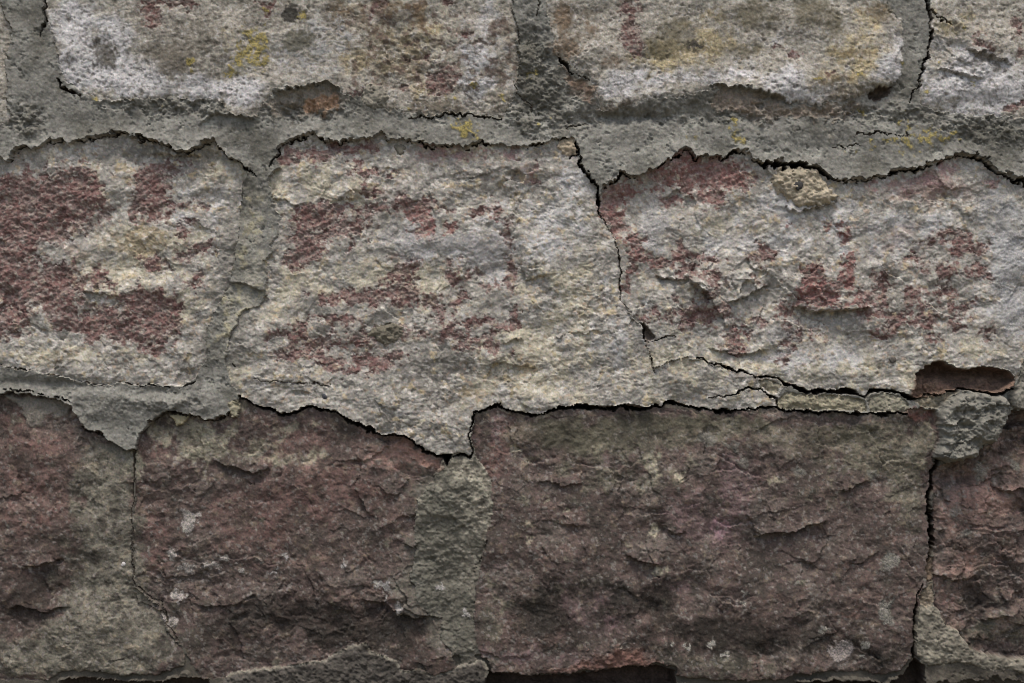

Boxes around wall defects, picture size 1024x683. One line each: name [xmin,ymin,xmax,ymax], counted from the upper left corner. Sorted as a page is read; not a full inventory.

crack [909,0,953,103]
crack [7,130,349,177]
crack [408,111,502,151]
crack [657,130,1024,188]
crack [529,123,676,374]
crack [3,366,93,402]
crack [81,426,105,437]
peeling [228,400,241,418]
crack [124,357,1014,460]
spalling [905,361,1021,423]
crack [911,455,954,659]
spalling [537,644,664,674]